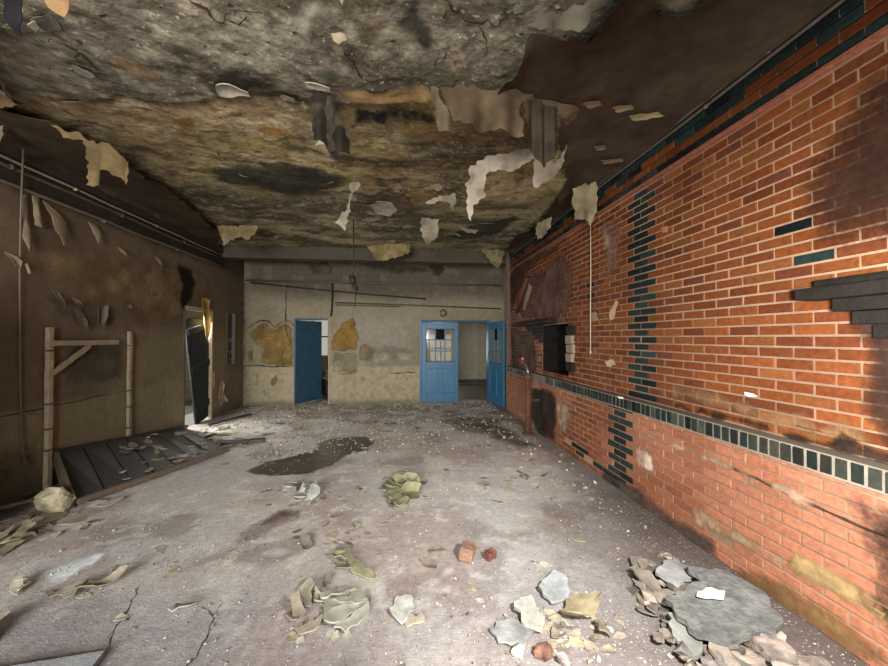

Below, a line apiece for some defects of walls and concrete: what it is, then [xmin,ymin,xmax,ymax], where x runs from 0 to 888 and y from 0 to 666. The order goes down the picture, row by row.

peeling [44,0,70,18]
crack [189,0,264,25]
peeling [528,0,603,33]
flaking render [216,70,269,98]
peeling [304,70,350,161]
peeling [0,79,258,251]
water stain [207,163,342,196]
peeling [332,84,567,261]
peeling [572,182,598,226]
crack [243,282,294,367]
water stain [248,437,374,476]
crack [186,606,220,666]